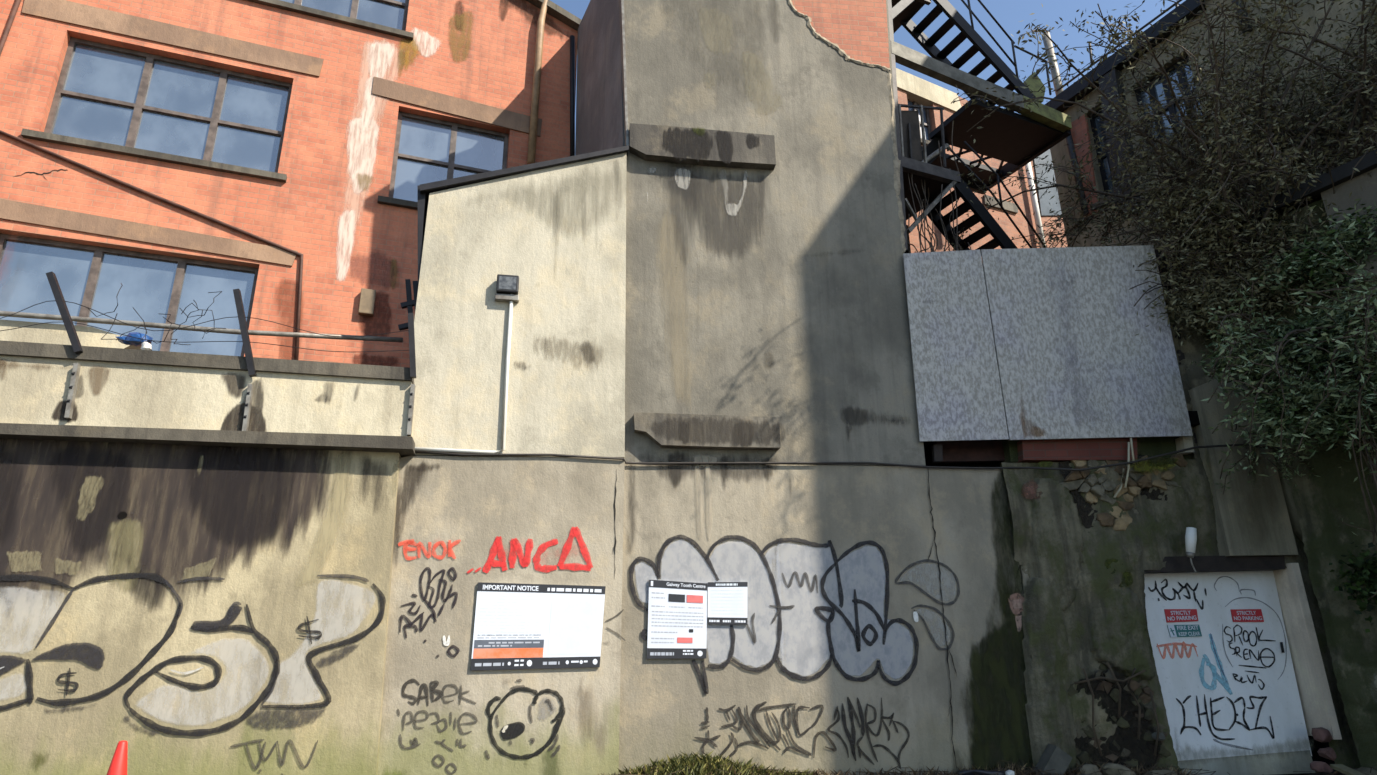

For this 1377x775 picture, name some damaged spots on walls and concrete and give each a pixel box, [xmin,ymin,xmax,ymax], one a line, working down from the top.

damp [338,28,439,337]
damp [675,130,764,254]
flaking render [788,0,906,252]
damp [354,354,398,366]
damp [53,448,129,549]
damp [192,374,293,544]
damp [395,465,433,546]
damp [648,423,772,539]
flaking render [1058,437,1187,531]
damp [132,571,162,605]
crack [928,471,957,769]